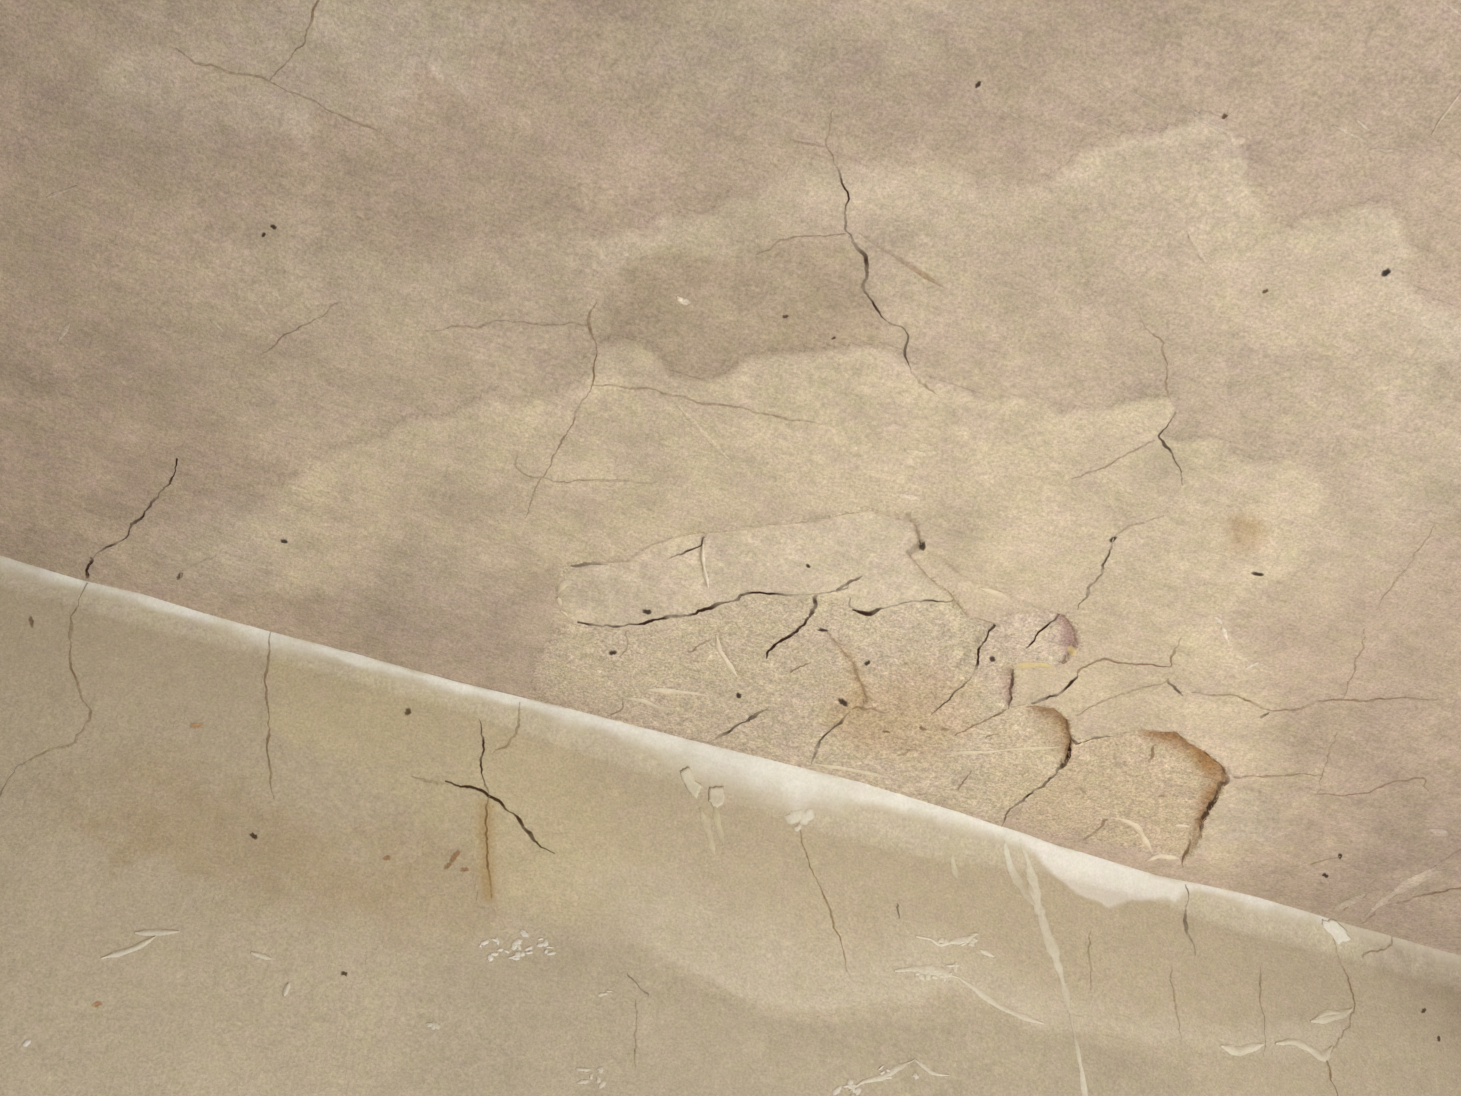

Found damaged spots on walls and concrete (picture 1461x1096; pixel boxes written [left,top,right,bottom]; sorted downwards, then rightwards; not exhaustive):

crack [756,109,938,395]
crack [440,302,822,517]
crack [0,458,178,797]
crack [264,631,275,799]
rust [444,793,504,908]
crack [411,702,555,898]
spalling [0,506,1461,969]